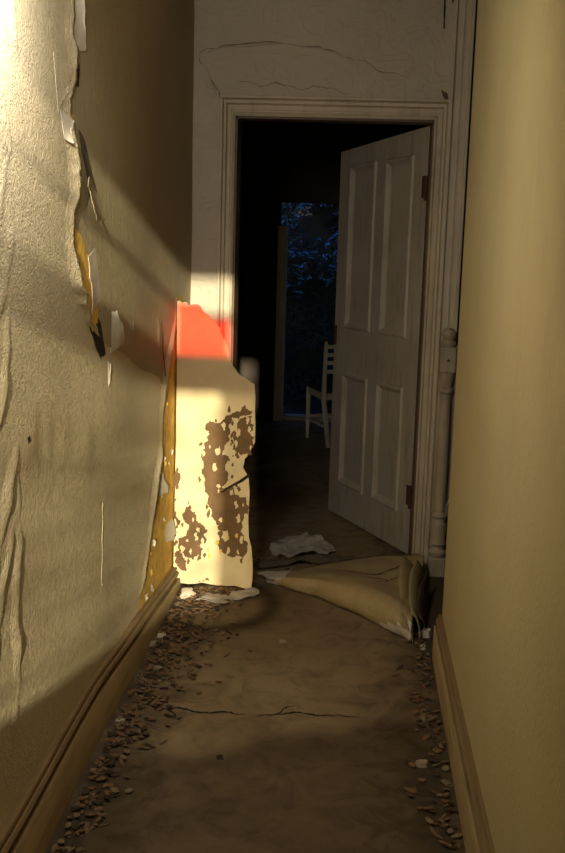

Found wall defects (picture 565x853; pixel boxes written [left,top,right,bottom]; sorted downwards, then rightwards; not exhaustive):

flaking render [68,225,98,332]
flaking render [139,325,254,610]
crack [132,701,360,720]